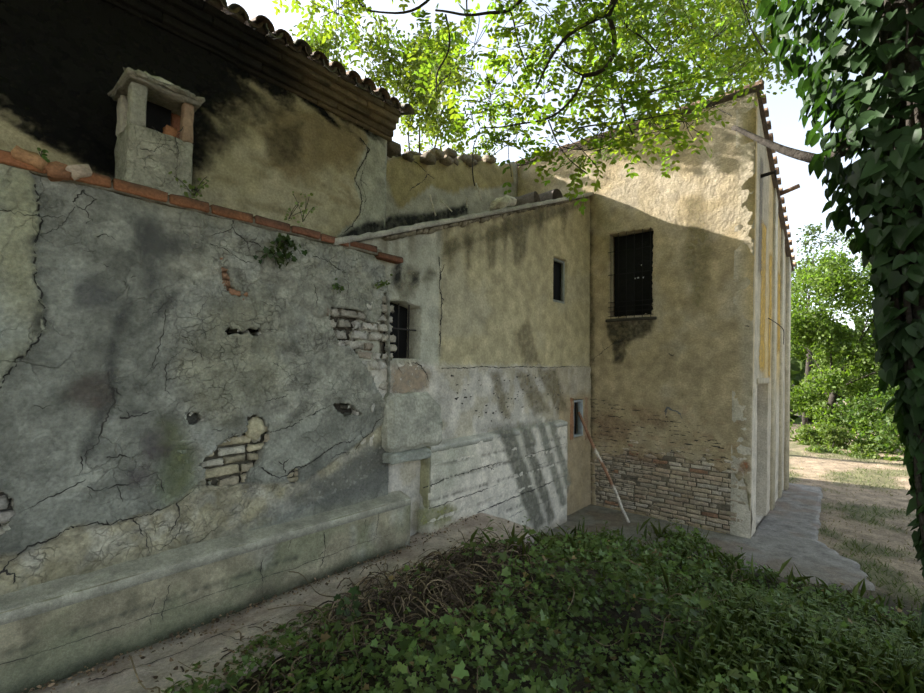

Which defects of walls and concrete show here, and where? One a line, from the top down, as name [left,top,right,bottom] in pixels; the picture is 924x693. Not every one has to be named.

spalling [0,184,47,388]
crack [0,190,134,285]
spalling [220,258,248,300]
crack [211,220,262,263]
damp [758,159,781,376]
crack [146,297,290,393]
spalling [326,294,427,415]
spalling [0,491,15,535]
crack [0,372,218,583]
spalling [200,415,270,487]
crack [262,418,382,478]
peeling [590,399,753,534]